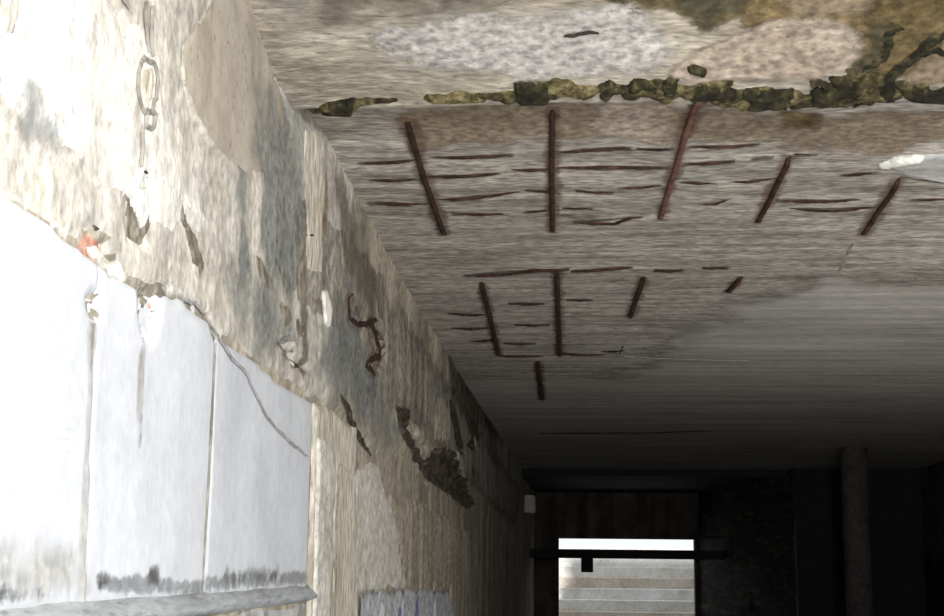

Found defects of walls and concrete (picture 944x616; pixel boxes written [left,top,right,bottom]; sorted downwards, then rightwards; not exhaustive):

flaking render [181,0,291,174]
water stain [323,0,667,80]
water stain [675,0,746,28]
water stain [670,17,858,82]
crack [853,23,944,108]
water stain [400,103,944,156]
flaking render [878,154,944,183]
crack [184,298,308,584]
spalling [396,398,475,509]